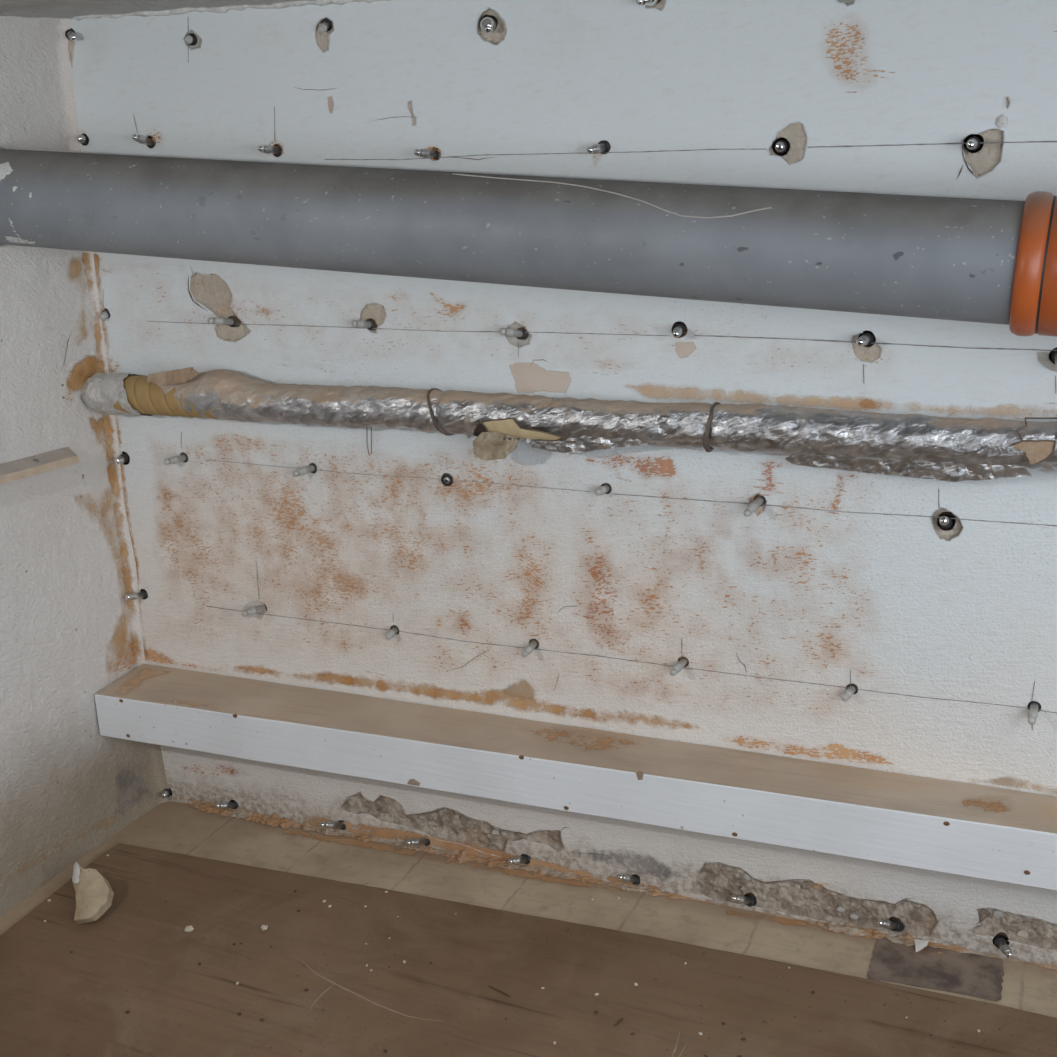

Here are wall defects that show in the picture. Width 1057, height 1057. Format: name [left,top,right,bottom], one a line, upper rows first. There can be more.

corrosion [825,22,895,93]
spalling [189,272,251,343]
corrosion [67,309,120,401]
corrosion [586,455,677,486]
corrosion [90,413,138,610]
corrosion [156,435,537,656]
corrosion [427,493,794,707]
corrosion [301,673,691,728]
corrosion [731,736,892,764]
spalling [339,792,582,859]
spalling [693,862,939,952]
spalling [967,907,1057,952]